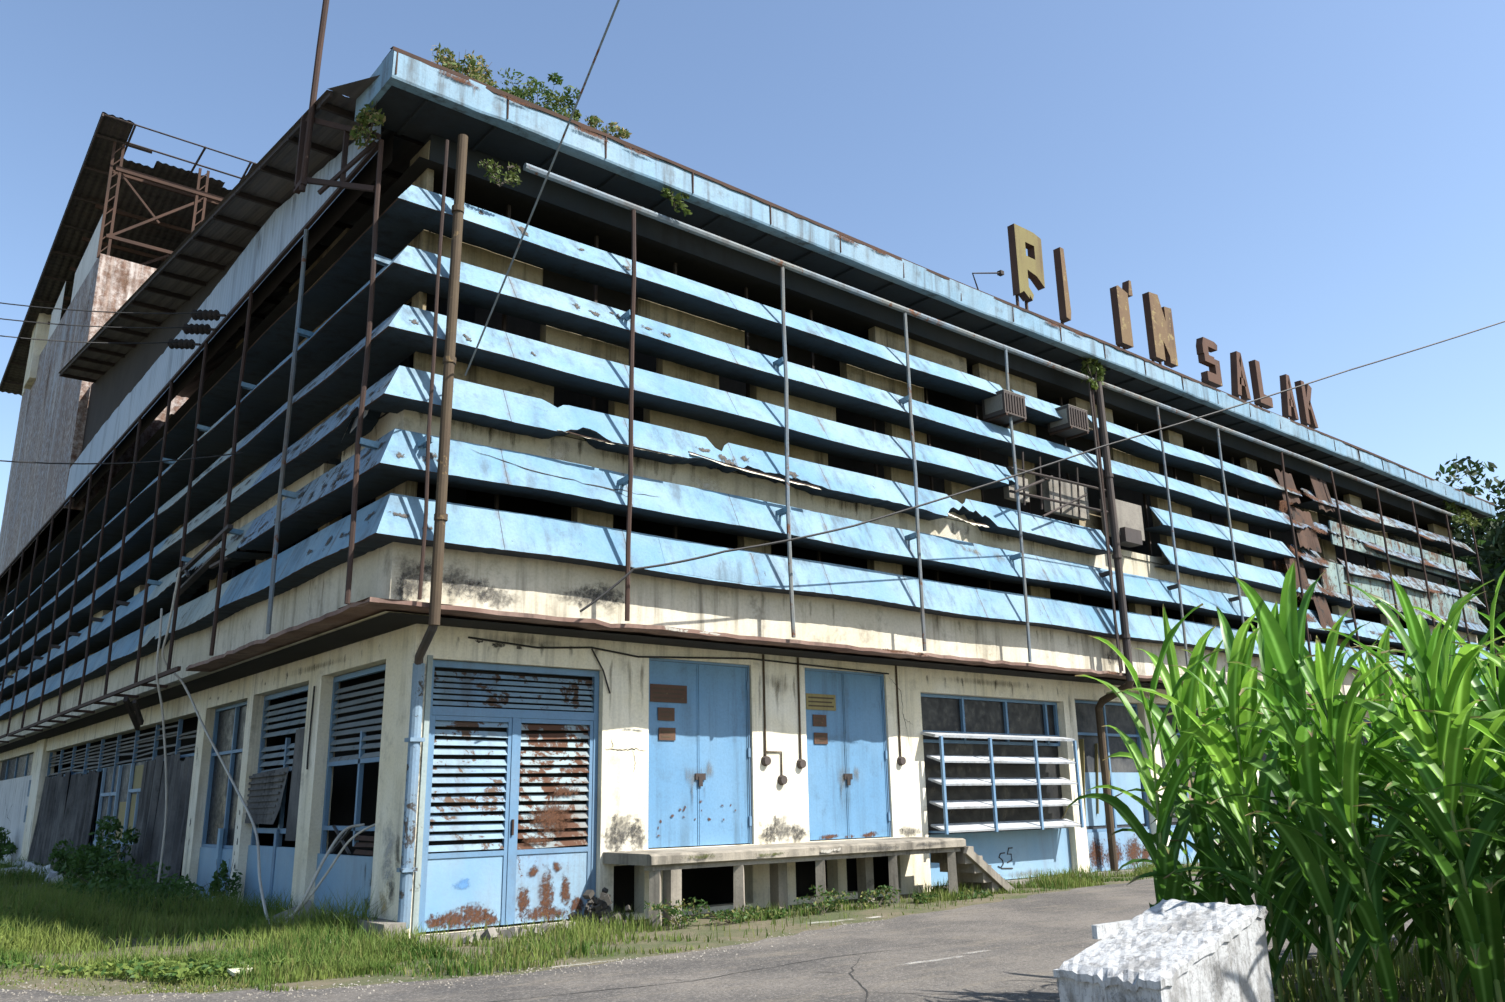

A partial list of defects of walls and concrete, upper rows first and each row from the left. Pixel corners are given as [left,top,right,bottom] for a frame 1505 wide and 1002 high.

peeling [688,446,819,488]
rust [1276,487,1326,533]
rust [1274,545,1330,574]
water stain [397,563,512,609]
water stain [565,587,623,606]
rust [1297,584,1336,624]
rust [524,786,579,846]
water stain [609,816,645,850]
water stain [762,816,805,842]
rust [517,862,584,922]
rust [427,905,498,929]